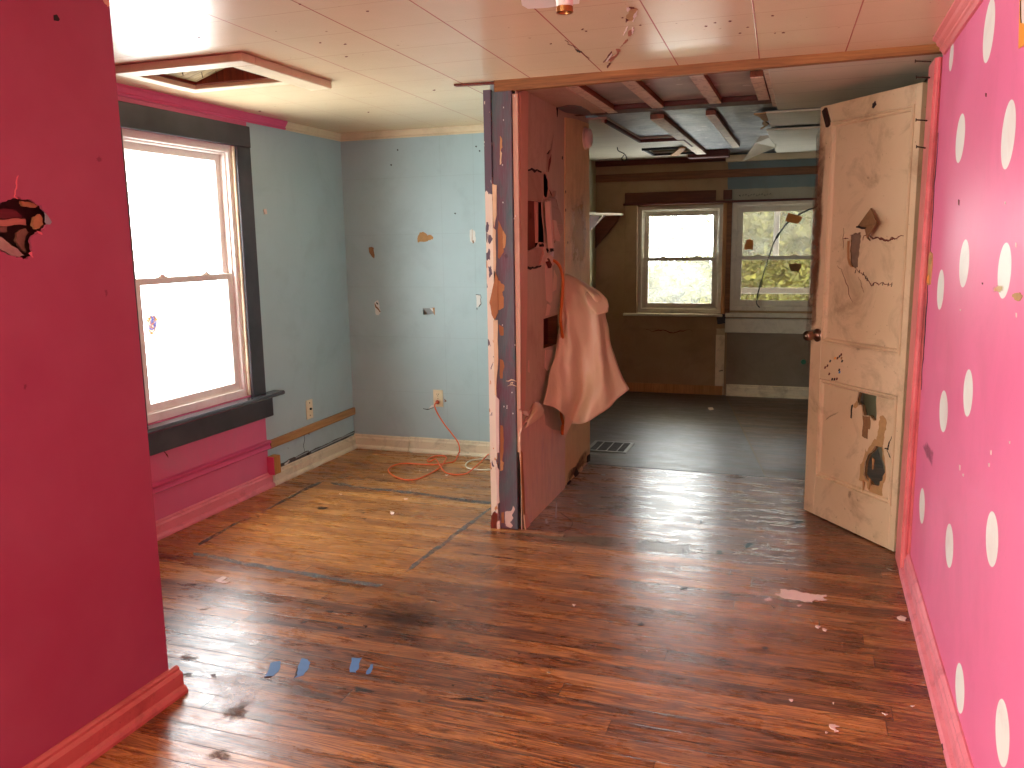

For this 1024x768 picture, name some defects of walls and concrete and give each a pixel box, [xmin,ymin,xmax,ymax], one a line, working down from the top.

peeling [603,7,638,68]
flaking render [0,228,29,257]
peeling [417,232,433,243]
peeling [514,91,549,416]
crack [843,234,904,242]
crack [855,270,892,287]
peeling [489,184,521,529]
spalling [850,401,887,496]